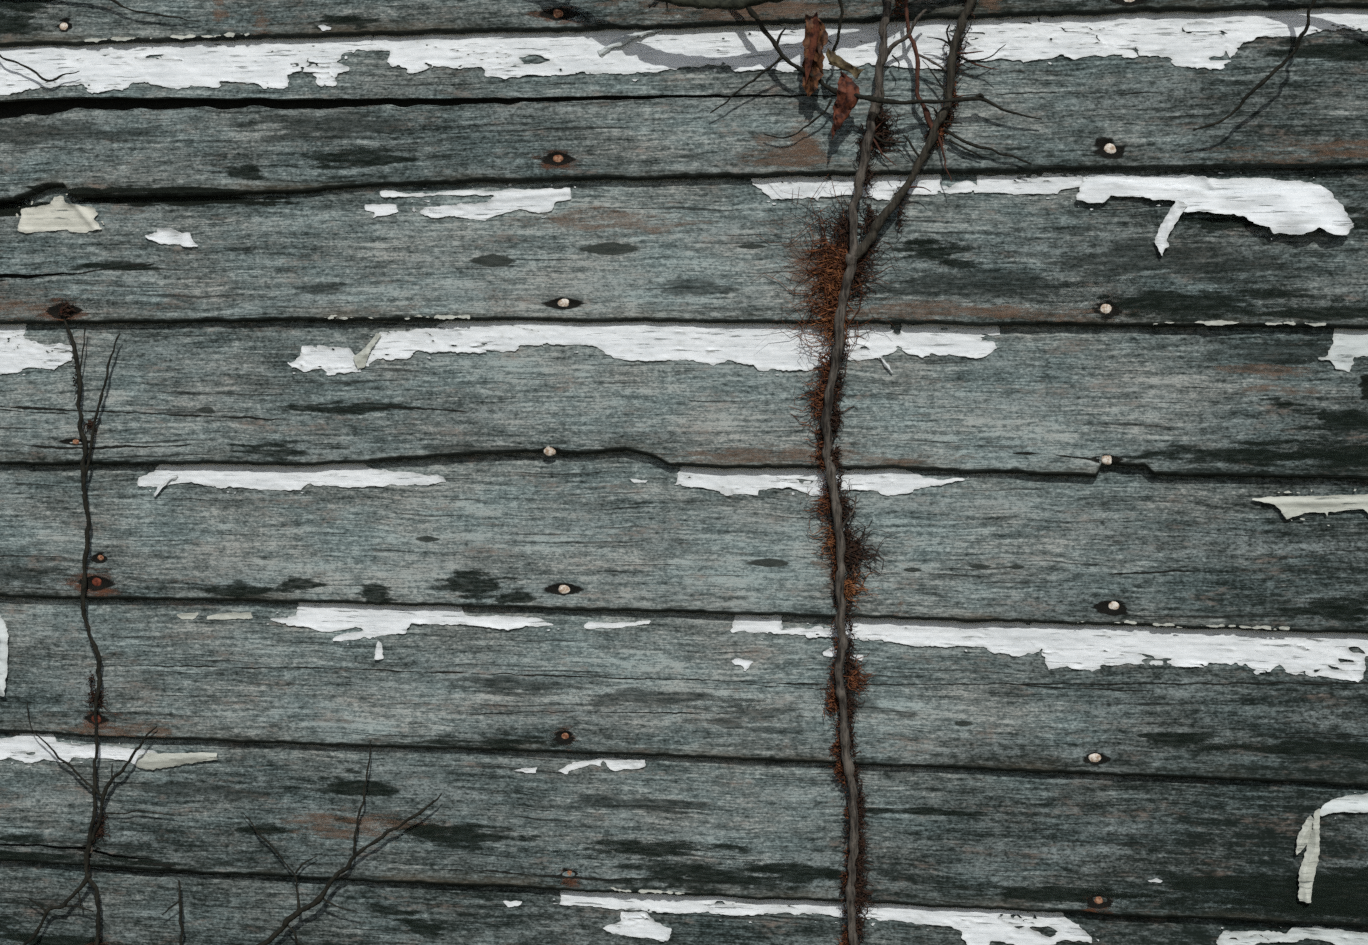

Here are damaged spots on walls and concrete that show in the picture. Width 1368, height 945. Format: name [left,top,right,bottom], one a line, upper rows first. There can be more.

peeling [0,23,806,95]
peeling [822,7,1368,70]
peeling [365,184,576,225]
peeling [751,171,1354,255]
peeling [288,315,1000,375]
peeling [137,463,446,496]
peeling [674,466,969,498]
peeling [177,602,553,660]
peeling [730,615,1368,682]
peeling [0,733,218,770]
peeling [553,887,1099,945]
peeling [1216,926,1368,945]